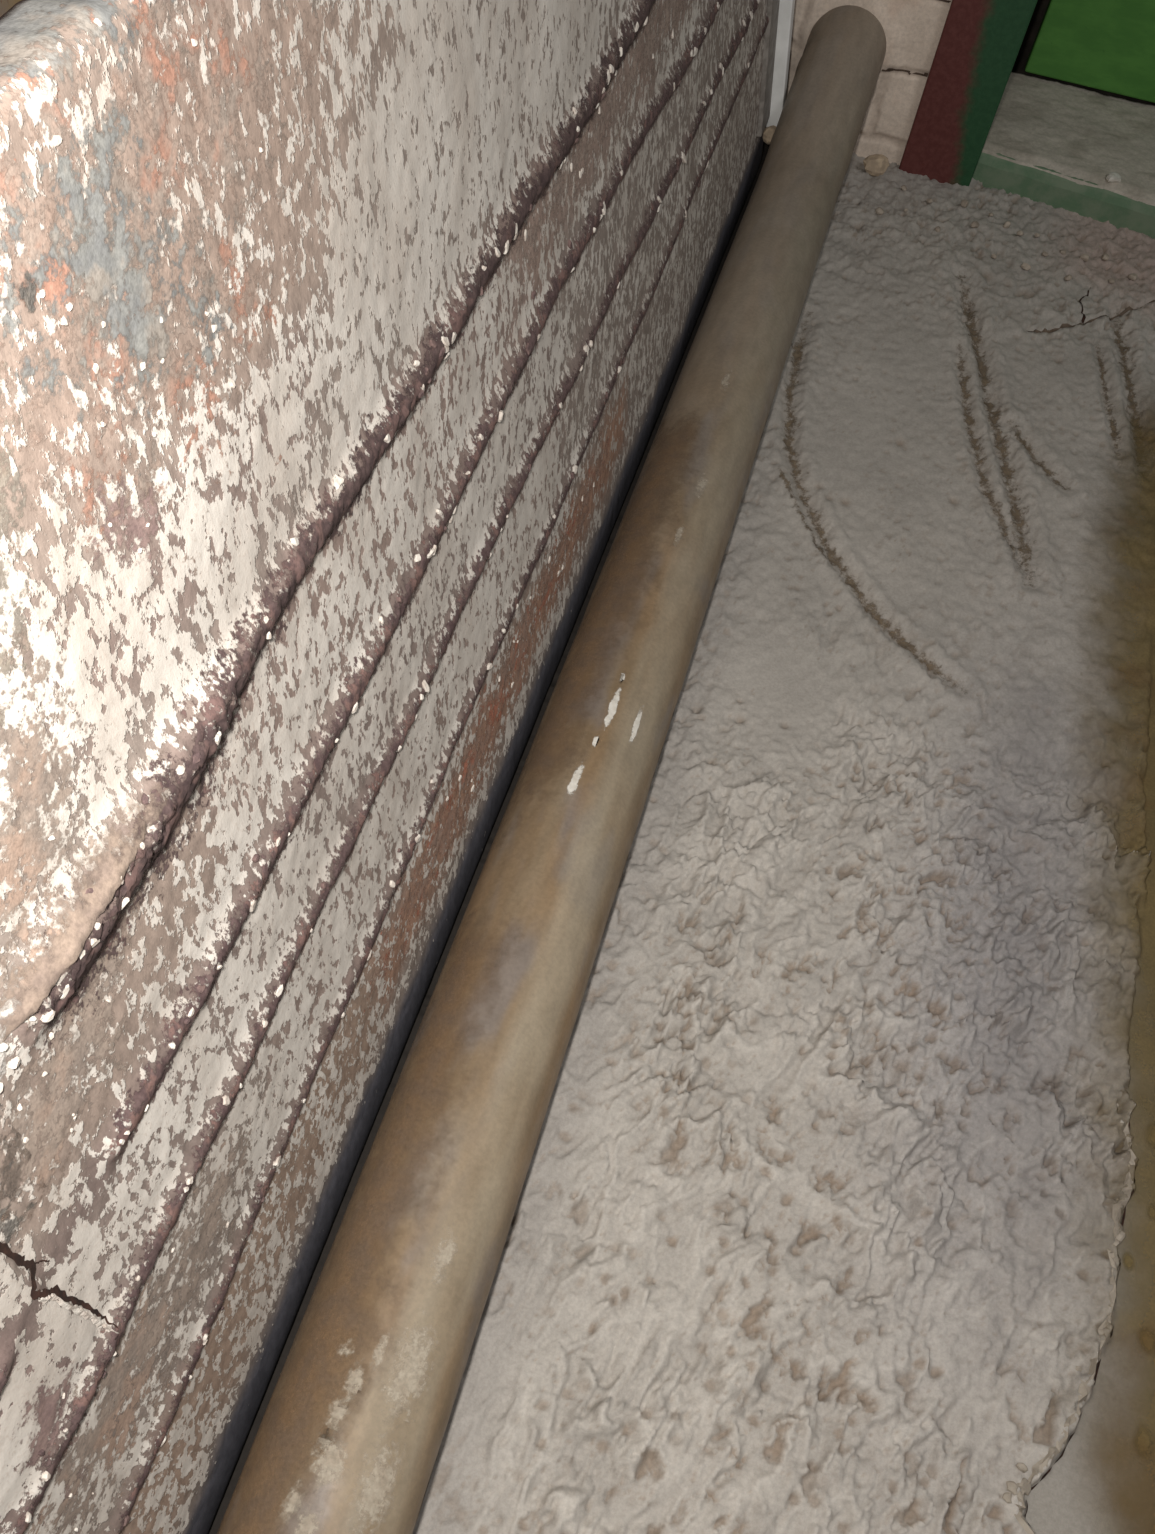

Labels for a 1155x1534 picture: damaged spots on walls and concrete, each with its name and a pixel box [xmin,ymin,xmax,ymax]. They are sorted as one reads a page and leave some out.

peeling [0,0,341,1251]
corrosion [14,0,769,1534]
peeling [364,431,613,1012]
efflorescence [0,964,22,1093]
corrosion [0,1350,12,1395]
crack [0,1242,118,1333]
peeling [21,1059,278,1534]